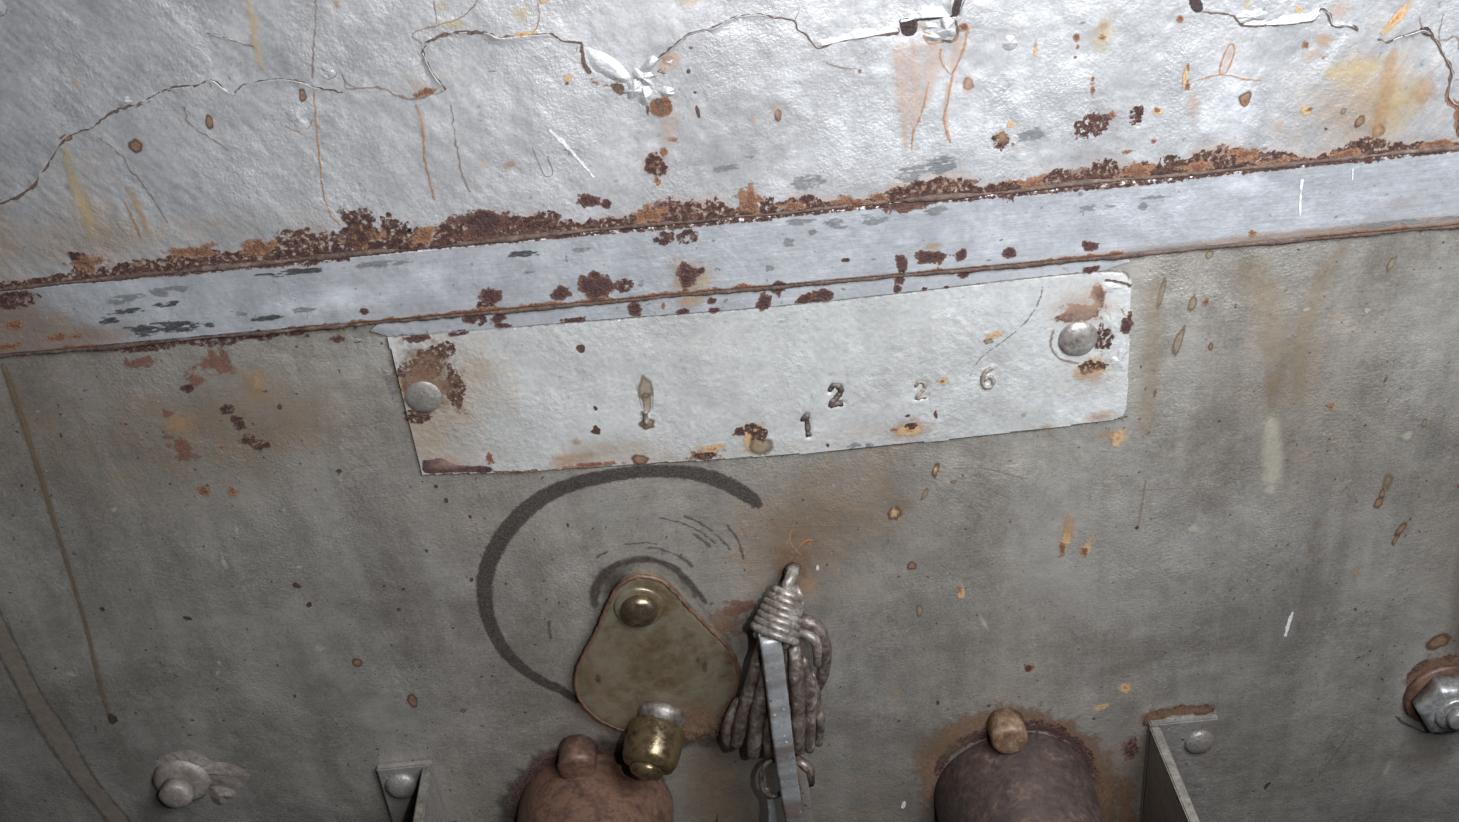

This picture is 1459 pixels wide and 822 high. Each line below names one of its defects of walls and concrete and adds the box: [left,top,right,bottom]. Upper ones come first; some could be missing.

crack [656,0,966,73]
rust [1381,4,1408,35]
crack [1190,0,1459,137]
crack [0,0,584,239]
rust [0,55,1459,424]
rust [163,409,198,461]
rust [219,404,271,453]
rust [1374,475,1393,508]
rust [1392,523,1407,545]
rust [1406,633,1459,686]
rust [916,684,1215,822]